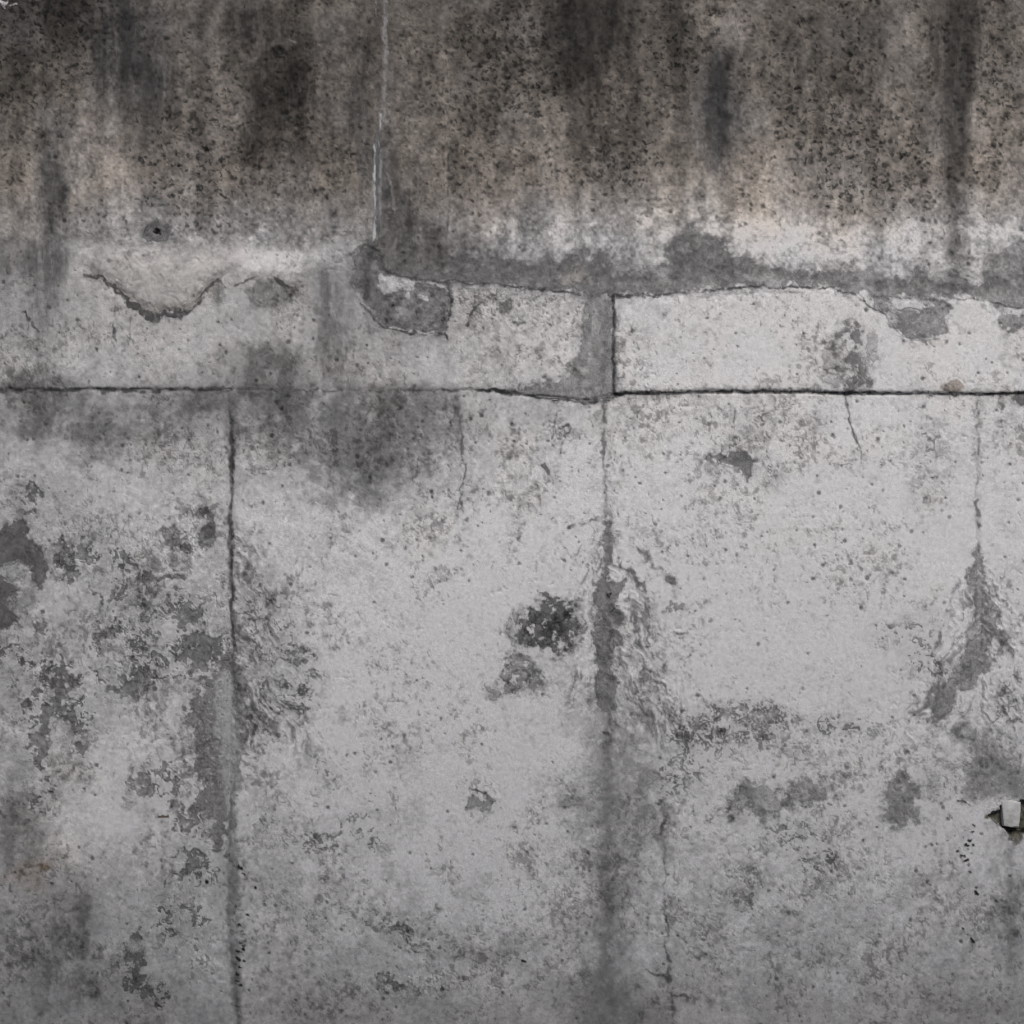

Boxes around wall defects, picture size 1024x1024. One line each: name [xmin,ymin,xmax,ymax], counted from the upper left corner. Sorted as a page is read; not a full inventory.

damp [34,94,74,230]
damp [0,0,160,117]
damp [133,13,316,215]
damp [348,16,447,268]
damp [459,0,617,127]
mould [591,127,659,189]
damp [653,20,728,170]
damp [774,0,1020,223]
spalling [349,223,1024,342]
crack [658,801,674,875]
spalling [985,803,1024,844]
crack [652,915,690,1008]